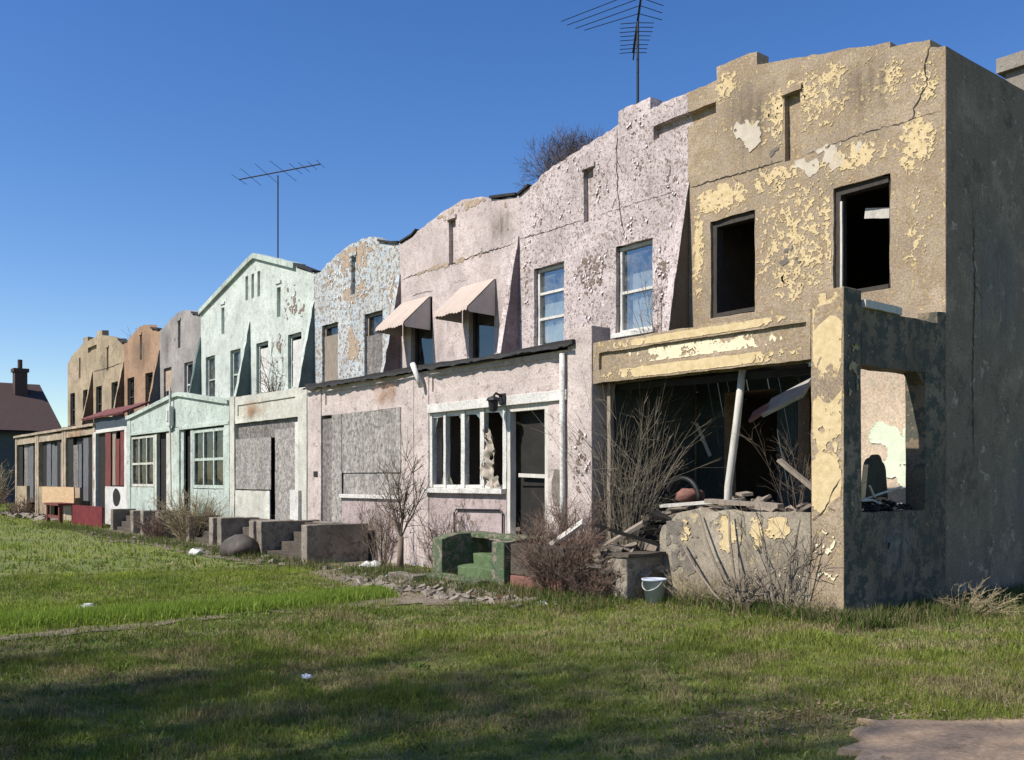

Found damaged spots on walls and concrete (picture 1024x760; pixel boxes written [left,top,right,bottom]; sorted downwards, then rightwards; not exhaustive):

crack [810,47,939,153]
crack [602,133,783,240]
peeling [324,241,375,306]
peeling [603,50,942,514]
peeling [346,327,360,366]
spalling [666,519,699,589]
peeling [716,515,790,553]